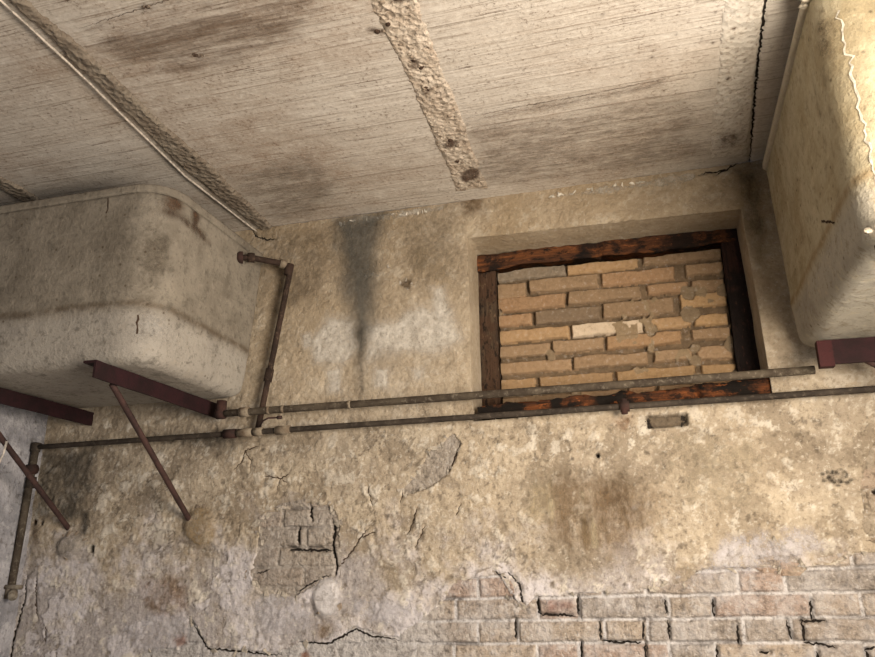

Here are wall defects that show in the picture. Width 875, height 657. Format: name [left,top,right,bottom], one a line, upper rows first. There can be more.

crack [704,0,767,174]
leakage [340,218,377,349]
crack [291,520,375,597]
crack [400,492,425,548]
spalling [139,434,875,657]
crack [10,576,47,657]
crack [300,628,400,645]